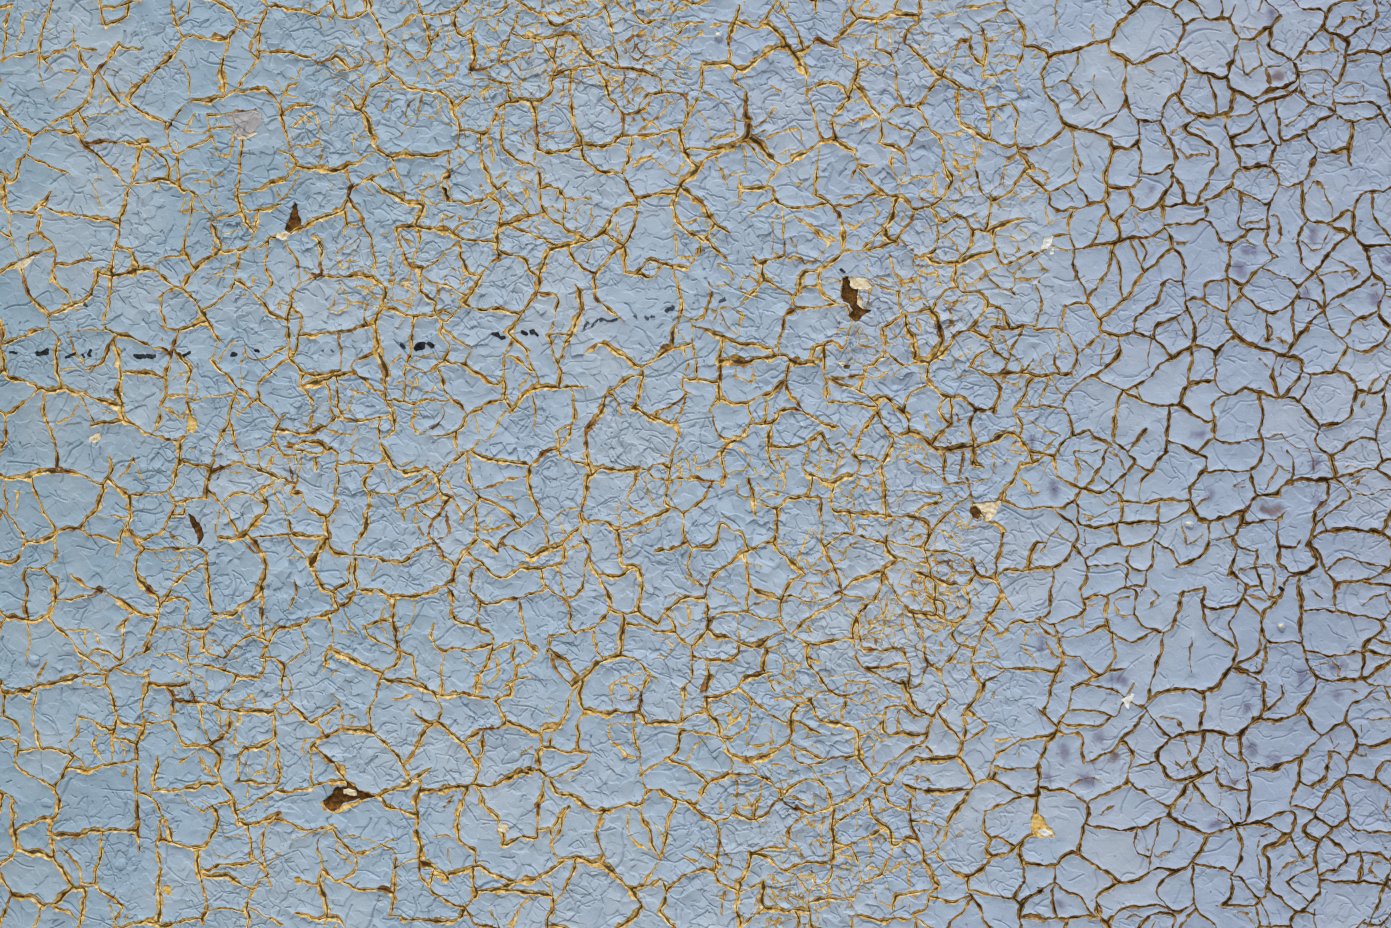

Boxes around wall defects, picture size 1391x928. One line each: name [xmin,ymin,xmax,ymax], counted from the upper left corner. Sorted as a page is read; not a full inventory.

crack [667,0,710,16]
crack [1177,148,1210,160]
peeling [276,203,301,240]
crack [787,216,837,265]
crack [1271,214,1283,246]
crack [328,282,364,314]
peeling [841,276,872,322]
crack [711,306,744,336]
crack [481,510,512,533]
crack [288,580,298,610]
crack [609,673,641,707]
peeling [321,782,375,814]